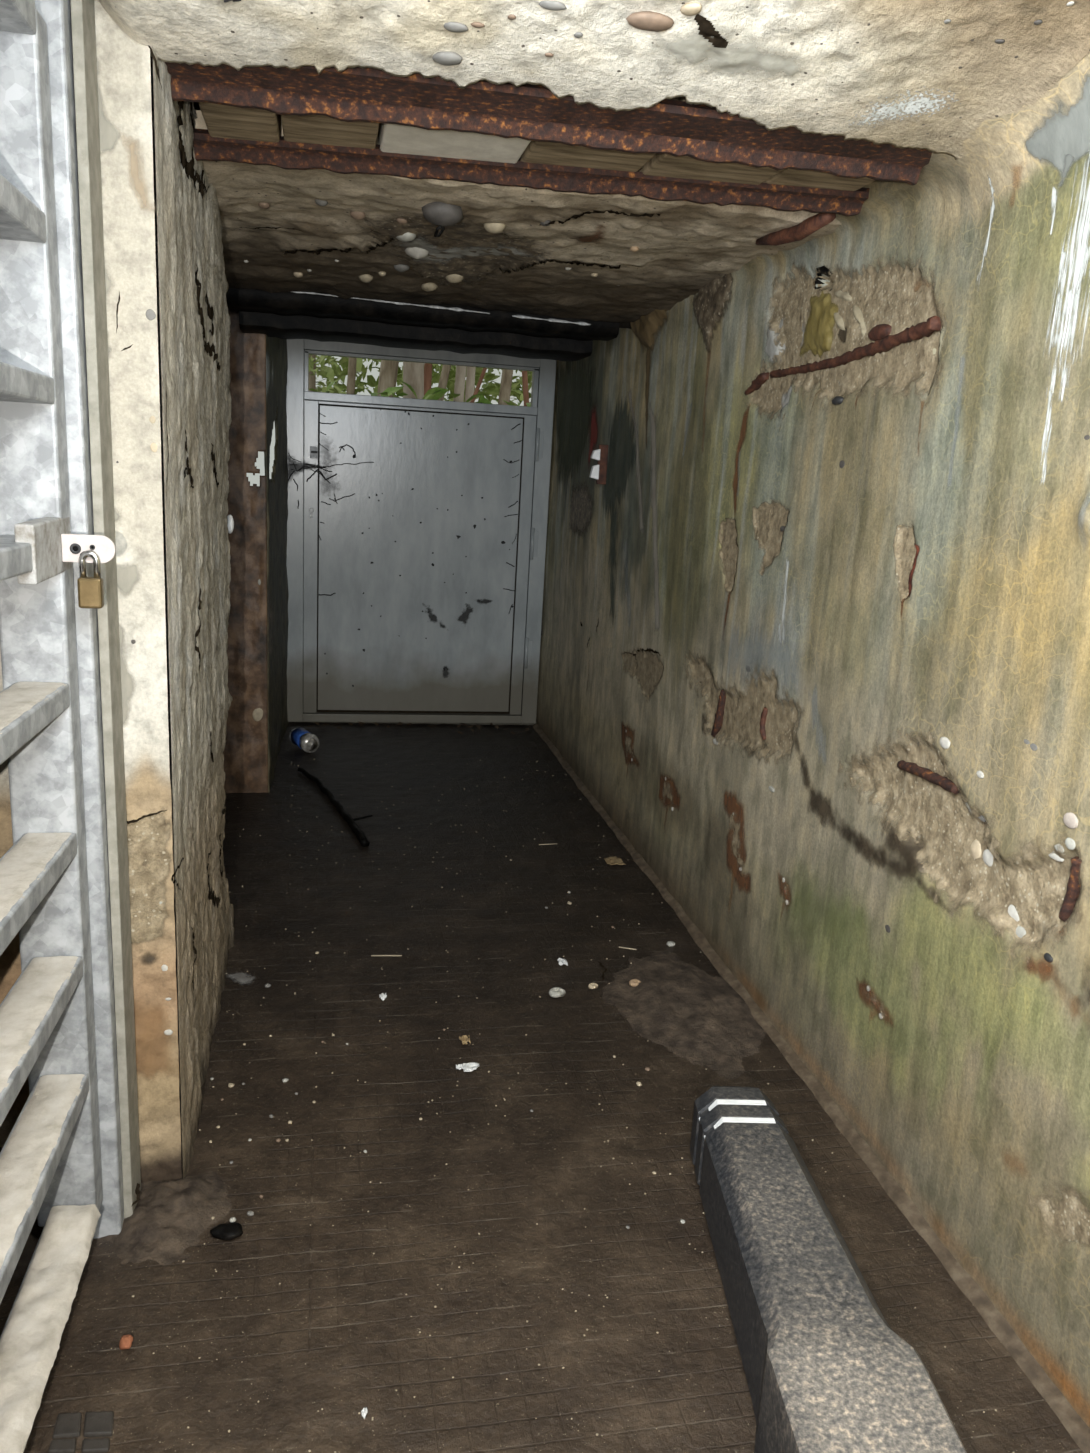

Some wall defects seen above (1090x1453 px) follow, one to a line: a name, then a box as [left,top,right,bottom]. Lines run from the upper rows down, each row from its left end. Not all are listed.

crack [504,210,660,273]
spalling [744,258,944,420]
water stain [1041,154,1090,479]
spalling [719,501,789,592]
spalling [893,525,920,616]
spalling [622,648,664,701]
spalling [685,651,802,763]
corrosion [724,792,750,891]
water stain [795,736,940,903]
spalling [839,731,1084,978]
spalling [1029,1187,1090,1245]